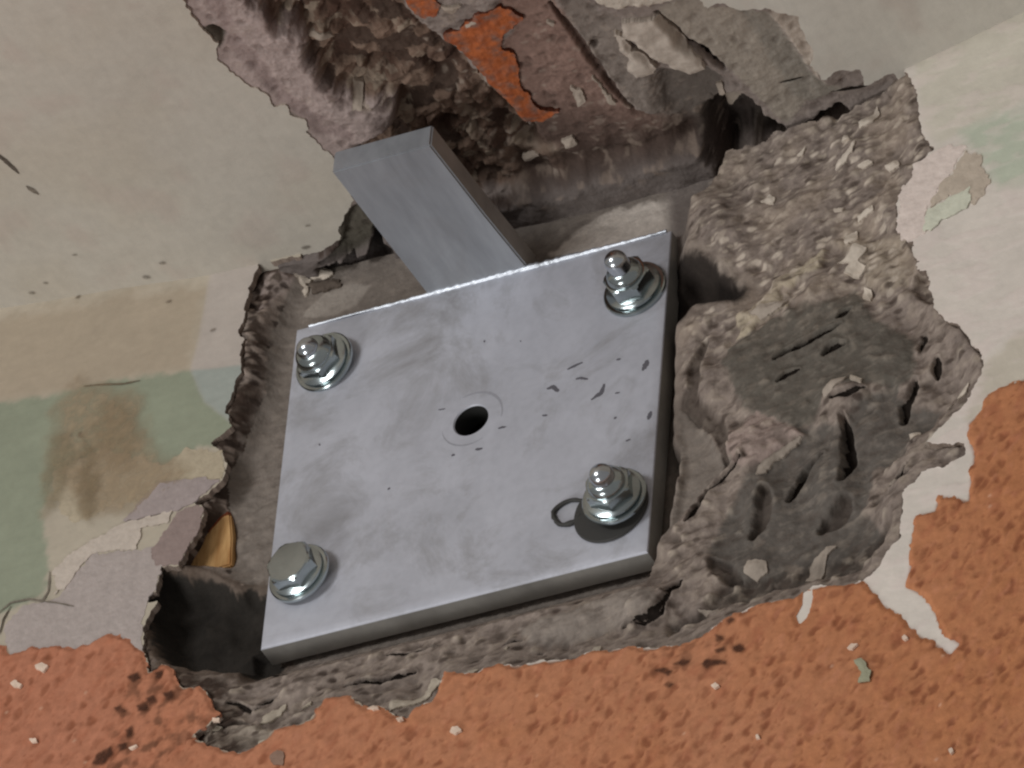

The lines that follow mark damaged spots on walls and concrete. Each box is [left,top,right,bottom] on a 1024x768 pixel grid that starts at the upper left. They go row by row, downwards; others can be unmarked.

spalling [186,0,991,649]
peeling [4,269,290,655]
crack [623,580,683,629]
spalling [145,576,650,753]
spalling [655,660,689,687]
spalling [702,635,726,668]
peeling [847,643,872,683]
spalling [137,691,173,711]